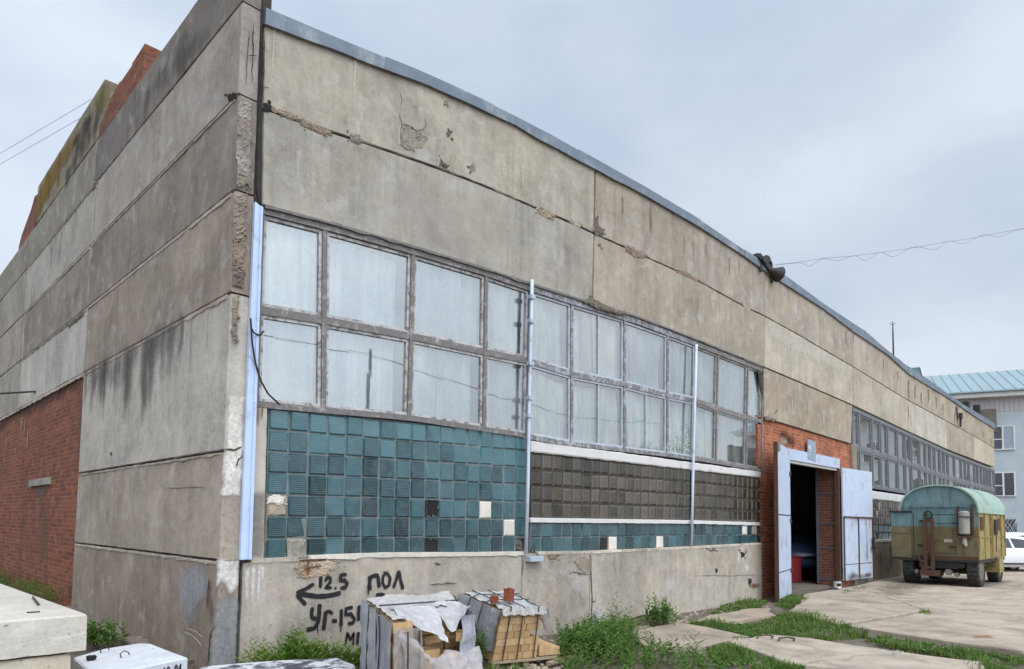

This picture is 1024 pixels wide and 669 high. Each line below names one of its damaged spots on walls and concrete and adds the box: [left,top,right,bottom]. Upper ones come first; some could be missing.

crack [246,26,270,97]
leakage [39,114,97,210]
spalling [224,92,333,343]
spalling [533,206,606,249]
spalling [622,244,650,259]
peeling [221,397,243,496]
spalling [266,494,287,505]
peeling [217,559,239,593]
spalling [293,558,340,579]